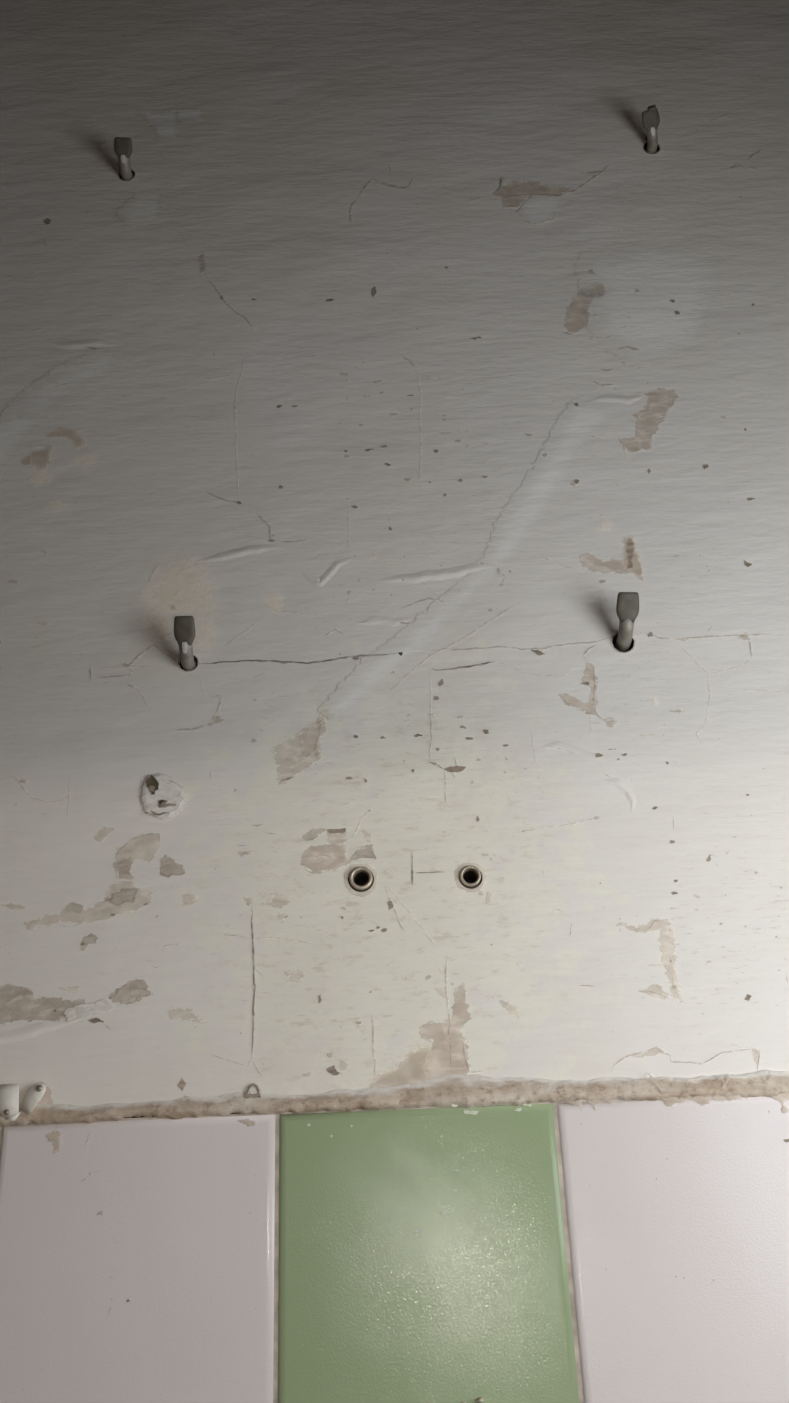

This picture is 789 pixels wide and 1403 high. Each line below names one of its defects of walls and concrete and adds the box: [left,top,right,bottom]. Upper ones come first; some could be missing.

peeling [493,167,607,225]
peeling [564,270,605,335]
peeling [620,388,677,452]
crack [90,598,594,715]
crack [648,632,757,655]
peeling [273,712,328,784]
peeling [24,773,188,950]
peeling [301,828,377,919]
peeling [0,979,151,1029]
crack [251,917,259,1072]
peeling [615,918,683,1002]